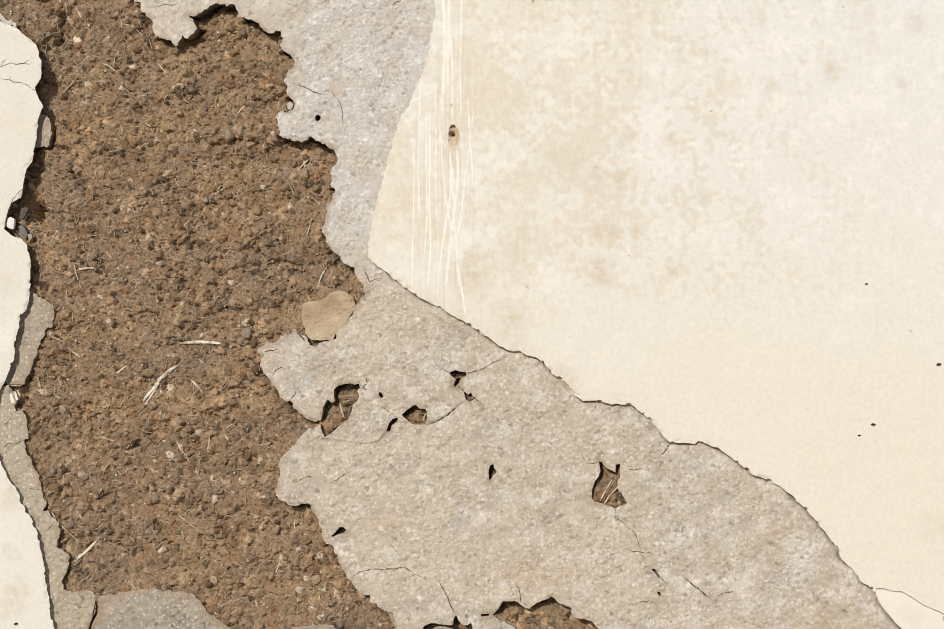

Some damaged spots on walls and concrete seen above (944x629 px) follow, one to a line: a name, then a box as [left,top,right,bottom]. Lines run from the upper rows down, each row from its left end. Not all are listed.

spalling [0,0,395,629]
spalling [451,370,466,386]
spalling [404,405,427,425]
spalling [592,461,627,508]
spalling [493,597,598,629]